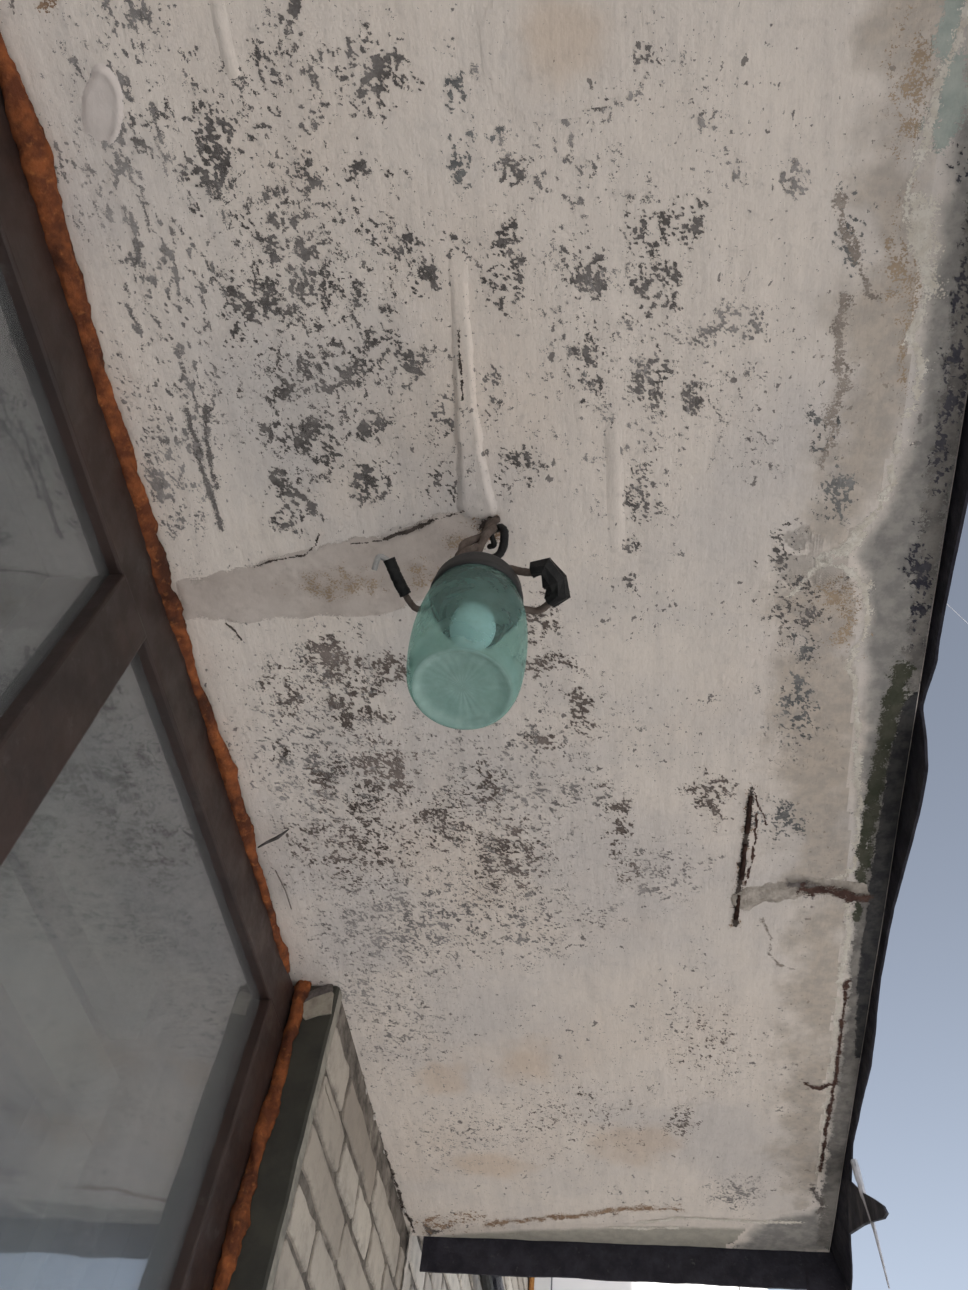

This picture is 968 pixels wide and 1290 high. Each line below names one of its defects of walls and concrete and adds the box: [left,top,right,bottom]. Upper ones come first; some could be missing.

crack [257,533,320,566]
crack [351,511,465,544]
water stain [391,0,968,1252]
rust [803,979,852,1172]